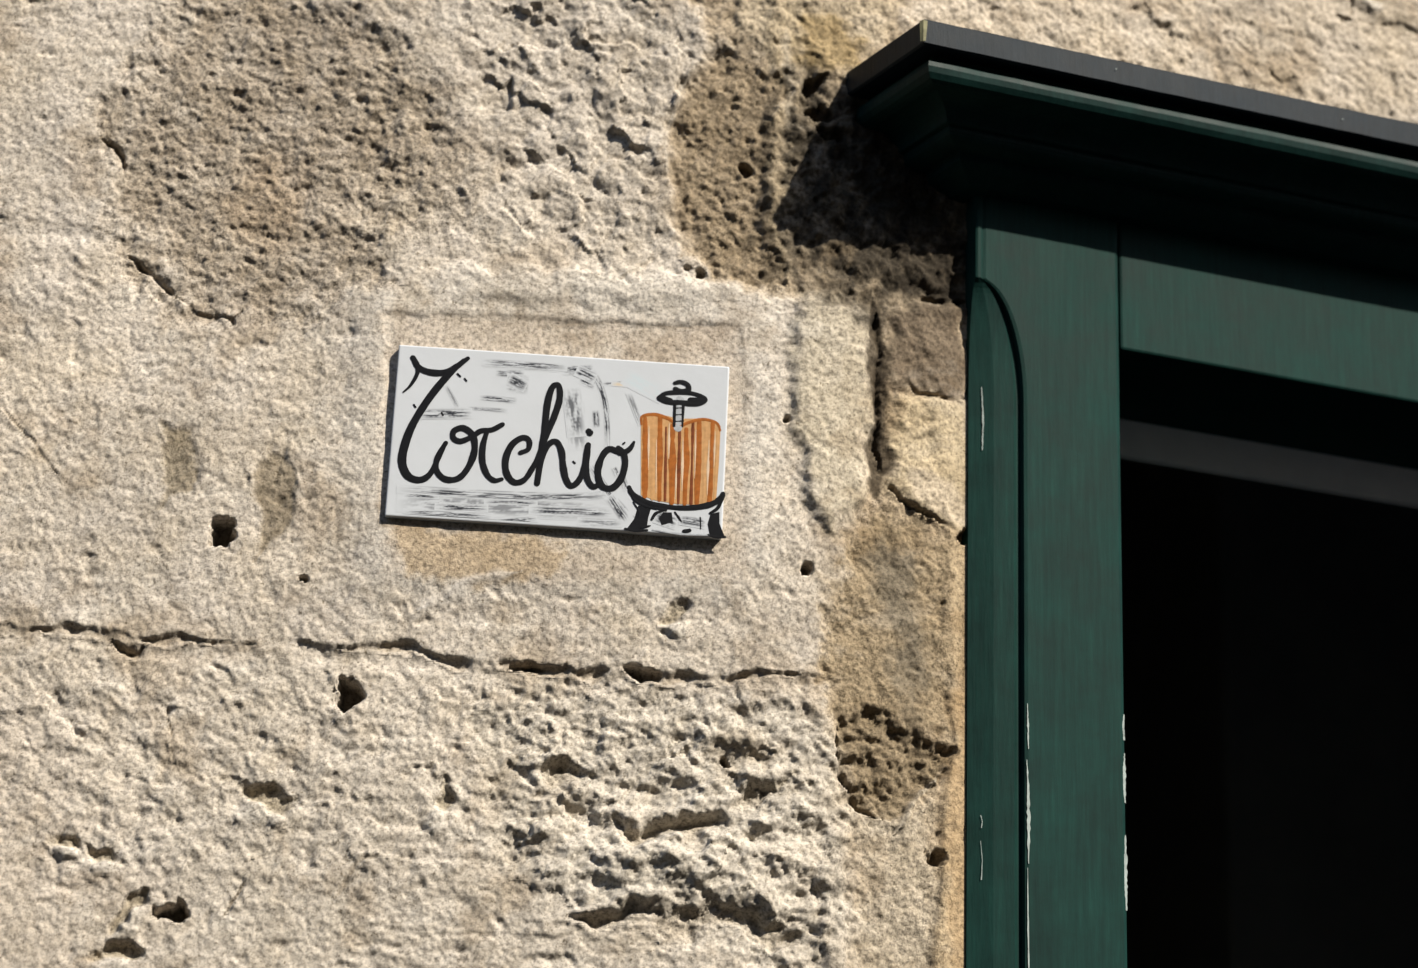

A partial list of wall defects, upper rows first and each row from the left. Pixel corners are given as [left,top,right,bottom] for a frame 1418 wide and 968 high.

water stain [737,66,967,506]
water stain [853,527,943,742]
spalling [422,675,944,968]